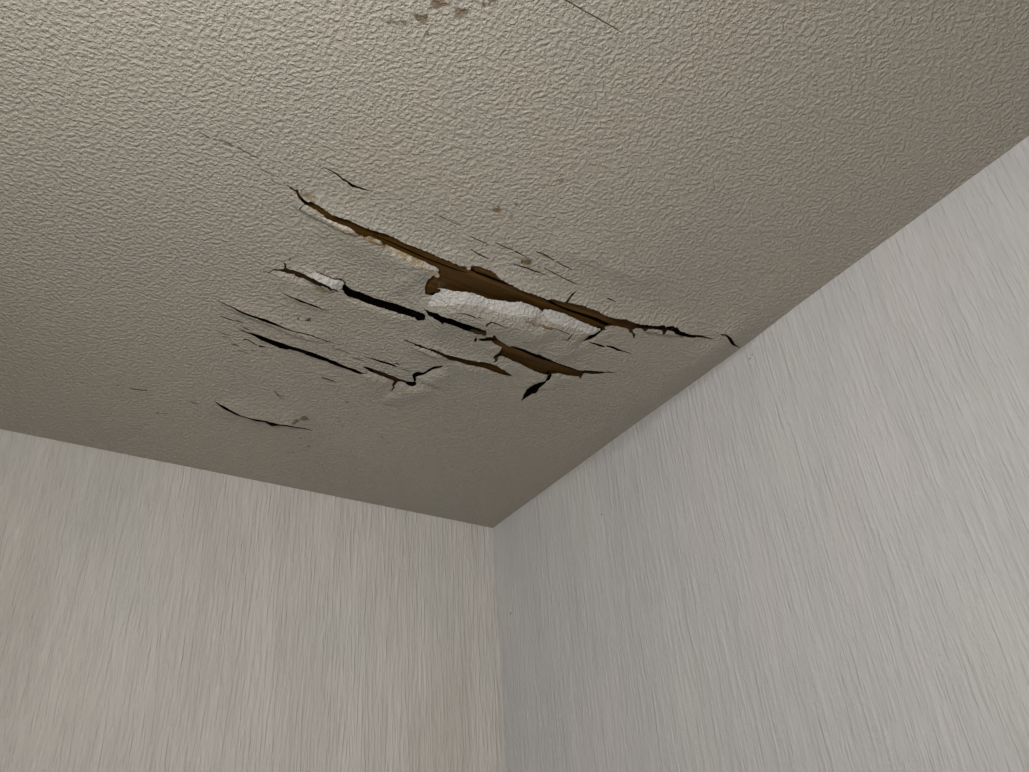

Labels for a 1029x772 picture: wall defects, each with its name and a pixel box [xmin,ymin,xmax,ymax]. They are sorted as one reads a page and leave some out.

crack [197,131,278,184]
crack [319,165,372,192]
crack [434,214,578,285]
crack [218,258,512,391]
crack [548,310,631,354]
crack [721,334,740,348]
crack [190,390,313,431]